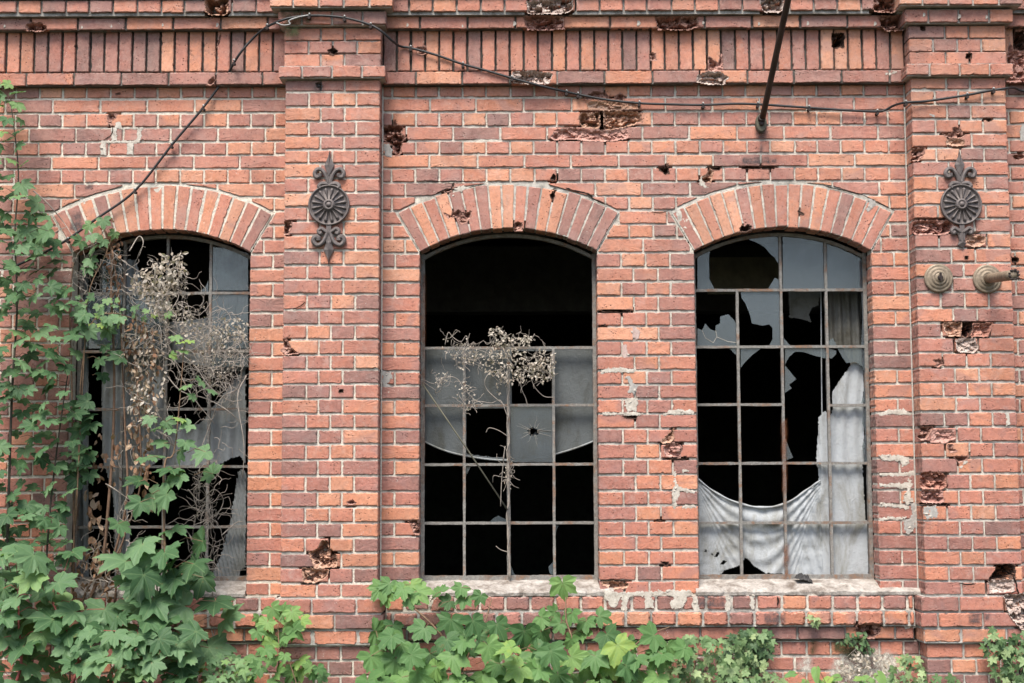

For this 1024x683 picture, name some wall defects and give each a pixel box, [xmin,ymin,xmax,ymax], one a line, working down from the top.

spalling [655,15,699,32]
spalling [697,54,729,85]
spalling [550,91,642,142]
spalling [383,120,407,157]
spalling [911,220,954,235]
spalling [941,322,993,353]
spalling [661,428,683,458]
spalling [917,426,969,464]
spalling [302,540,338,583]
spalling [987,563,1024,630]